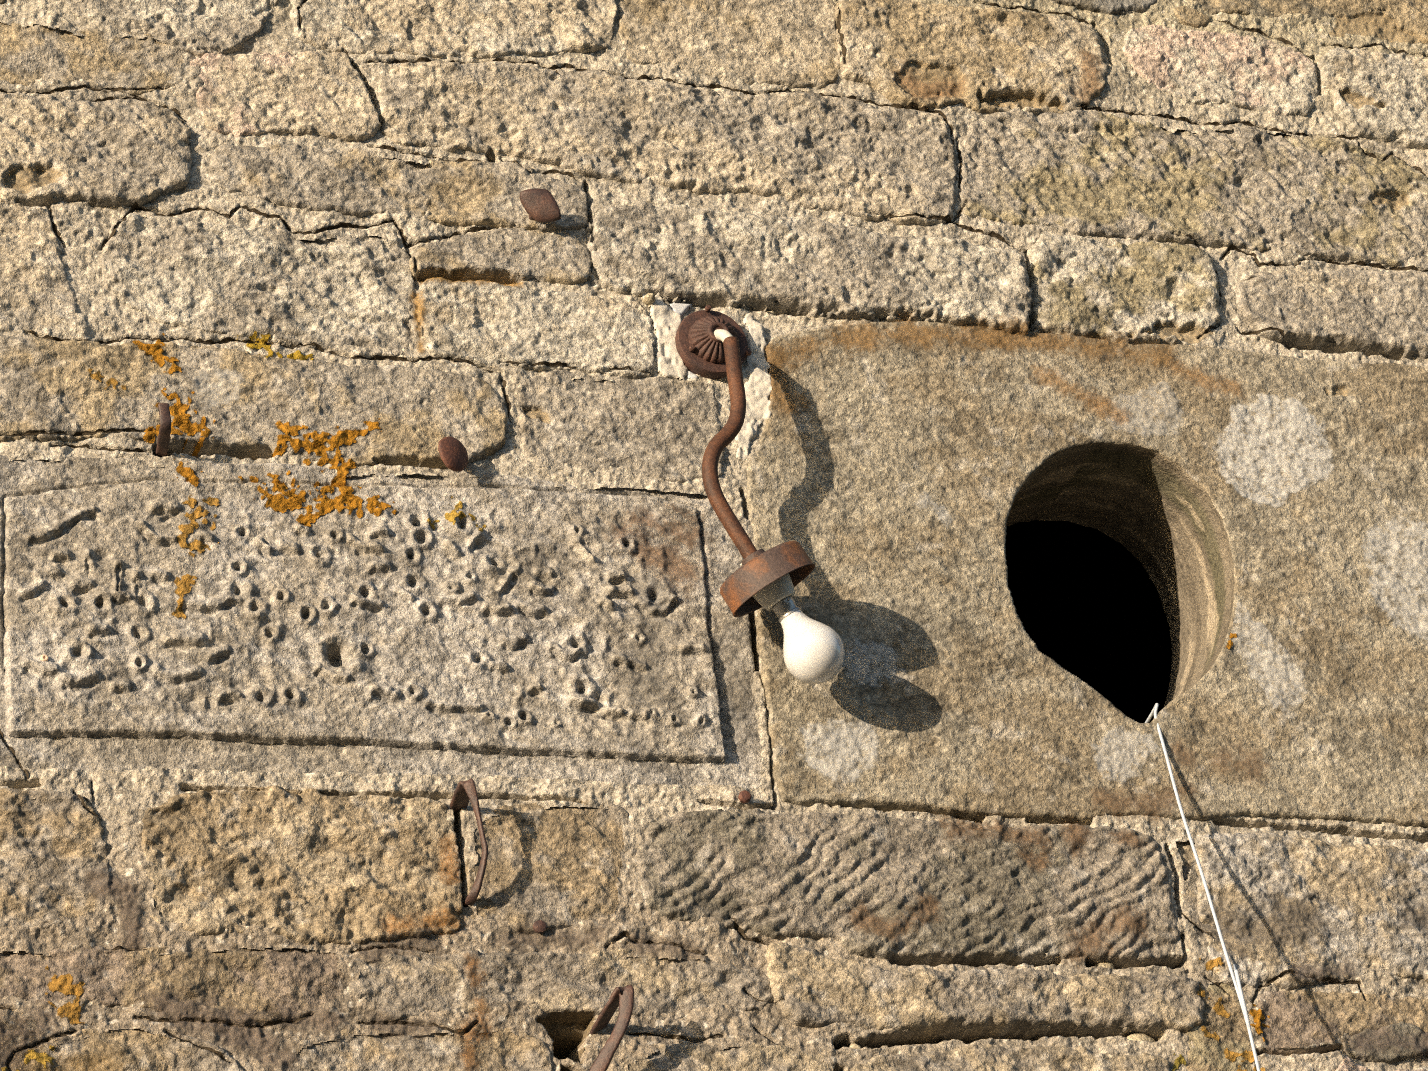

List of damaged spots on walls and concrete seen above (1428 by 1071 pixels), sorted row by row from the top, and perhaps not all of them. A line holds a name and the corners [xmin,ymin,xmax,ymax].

crack [0,730,29,779]